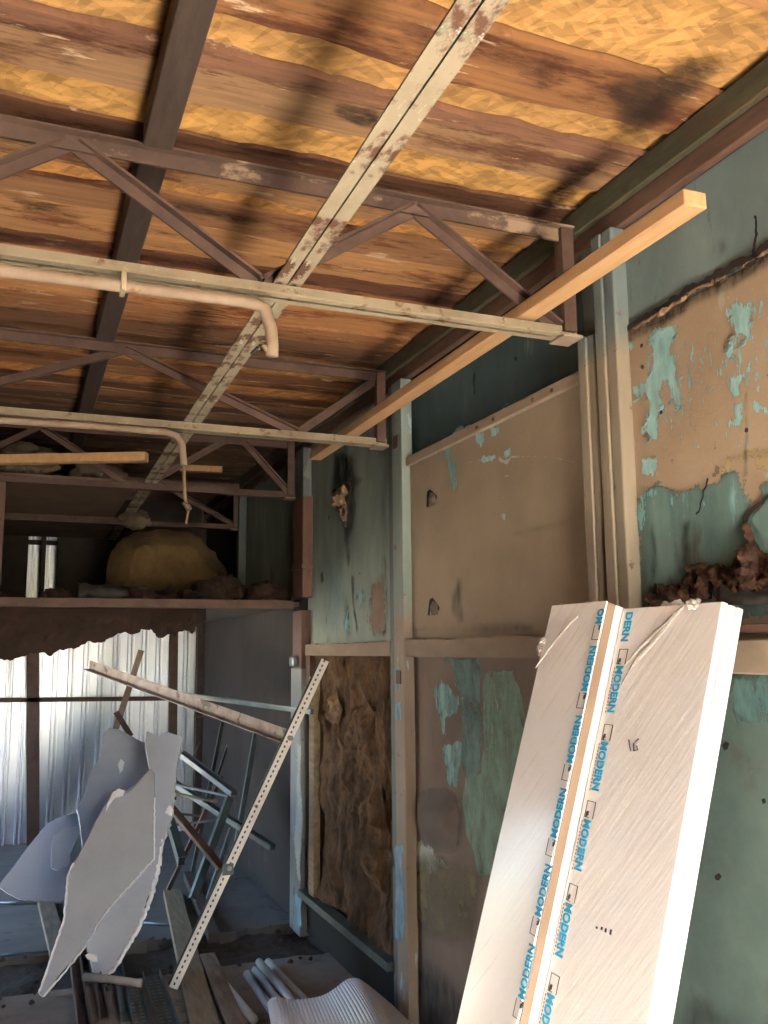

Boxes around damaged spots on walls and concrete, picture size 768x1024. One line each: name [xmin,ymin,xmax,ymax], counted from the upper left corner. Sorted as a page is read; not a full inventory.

leakage [610,63,720,131]
leakage [335,454,357,560]
peeling [631,298,768,620]
peeling [434,658,526,877]
peeling [416,840,444,870]